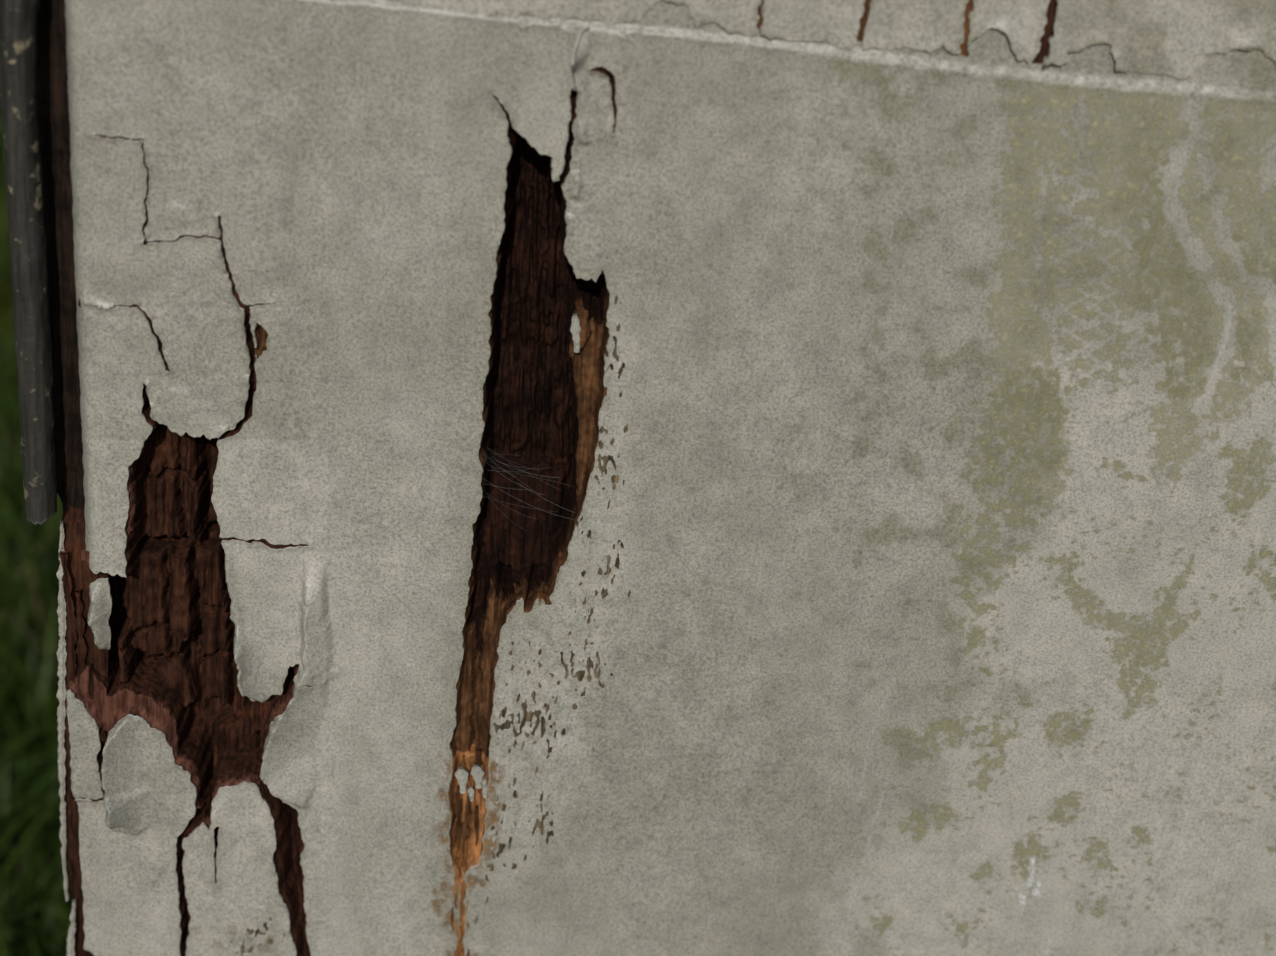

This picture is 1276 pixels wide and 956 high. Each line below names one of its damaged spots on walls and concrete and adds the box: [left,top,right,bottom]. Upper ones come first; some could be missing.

crack [756,0,764,29]
crack [856,0,871,42]
peeling [629,0,1121,71]
crack [959,0,974,57]
crack [1032,0,1057,64]
peeling [1172,24,1276,80]
crack [95,134,269,440]
crack [78,298,170,429]
peeling [455,26,631,904]
peeling [66,541,318,951]
peeling [1018,858,1041,905]